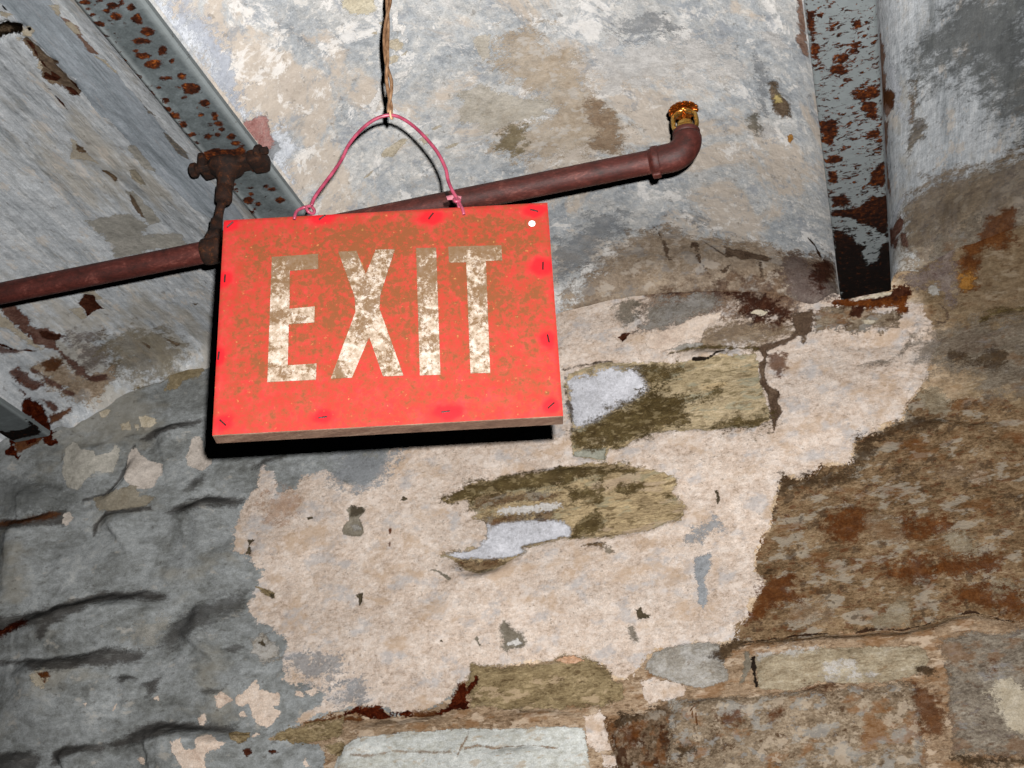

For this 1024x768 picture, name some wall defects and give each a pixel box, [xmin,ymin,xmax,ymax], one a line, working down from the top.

rust [244,116,281,160]
rust [829,284,912,318]
crack [669,331,800,430]
peeling [120,414,157,431]
peeling [61,442,163,512]
peeling [62,511,74,526]
peeling [164,293,1024,768]
peeling [29,671,50,689]